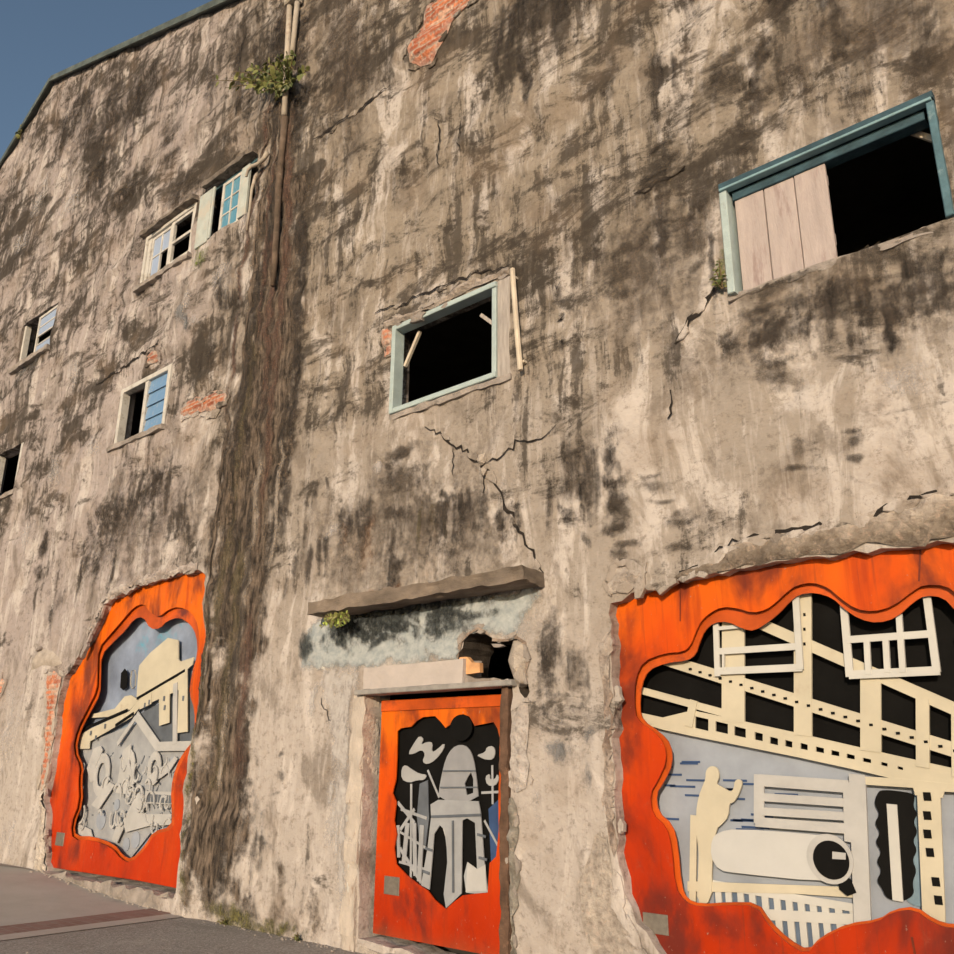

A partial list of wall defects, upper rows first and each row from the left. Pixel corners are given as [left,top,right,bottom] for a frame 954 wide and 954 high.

flaking render [402,0,479,71]
crack [314,85,390,139]
crack [674,287,715,344]
water stain [742,278,813,347]
water stain [860,243,954,351]
crack [666,389,674,419]
water stain [87,472,189,581]
water stain [181,1,313,917]
crack [425,425,556,573]
flaking render [34,670,65,872]
peeling [298,588,539,895]
spalling [505,697,534,954]